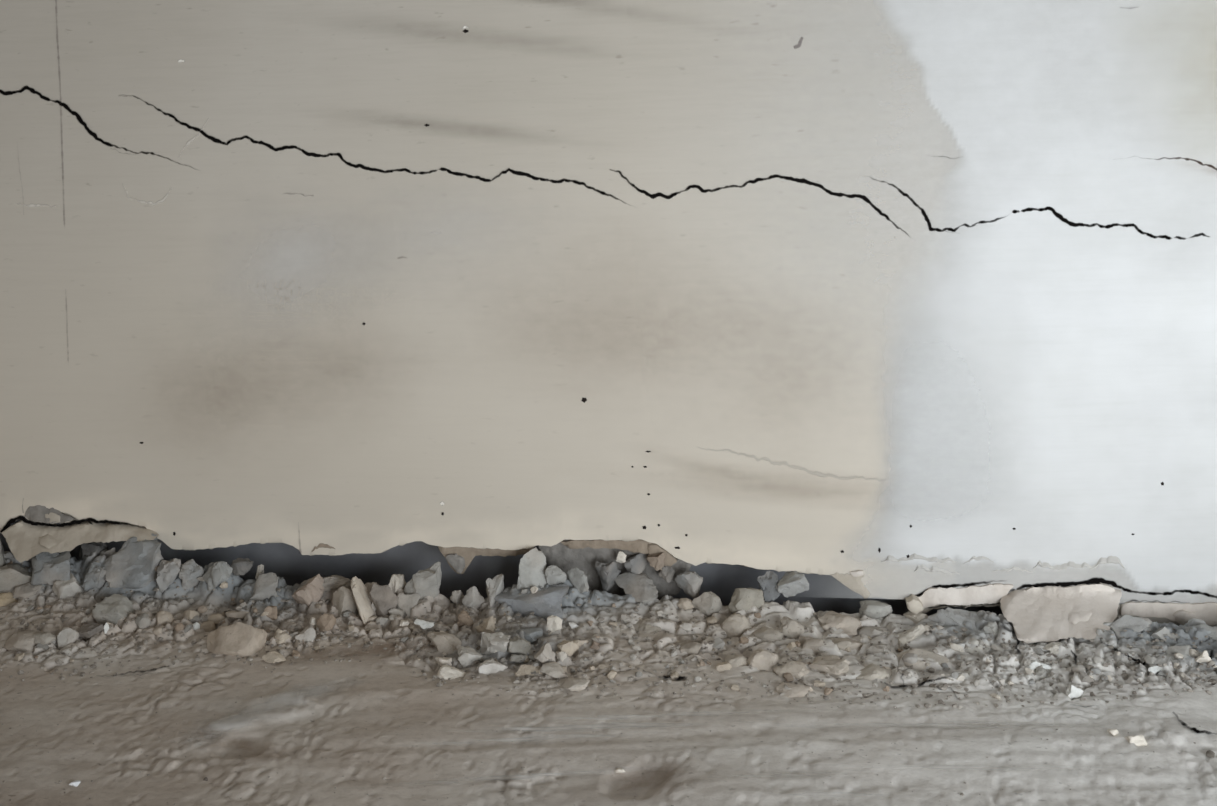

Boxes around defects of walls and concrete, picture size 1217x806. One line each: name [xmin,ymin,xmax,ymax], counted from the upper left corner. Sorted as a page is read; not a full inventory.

crack [0,86,161,157]
crack [134,96,1206,240]
crack [1175,157,1217,170]
peeling [2,505,159,563]
spalling [438,539,693,600]
spalling [830,570,872,599]
flaking render [882,553,1125,643]
crack [916,578,1217,666]
spalling [1026,660,1051,672]